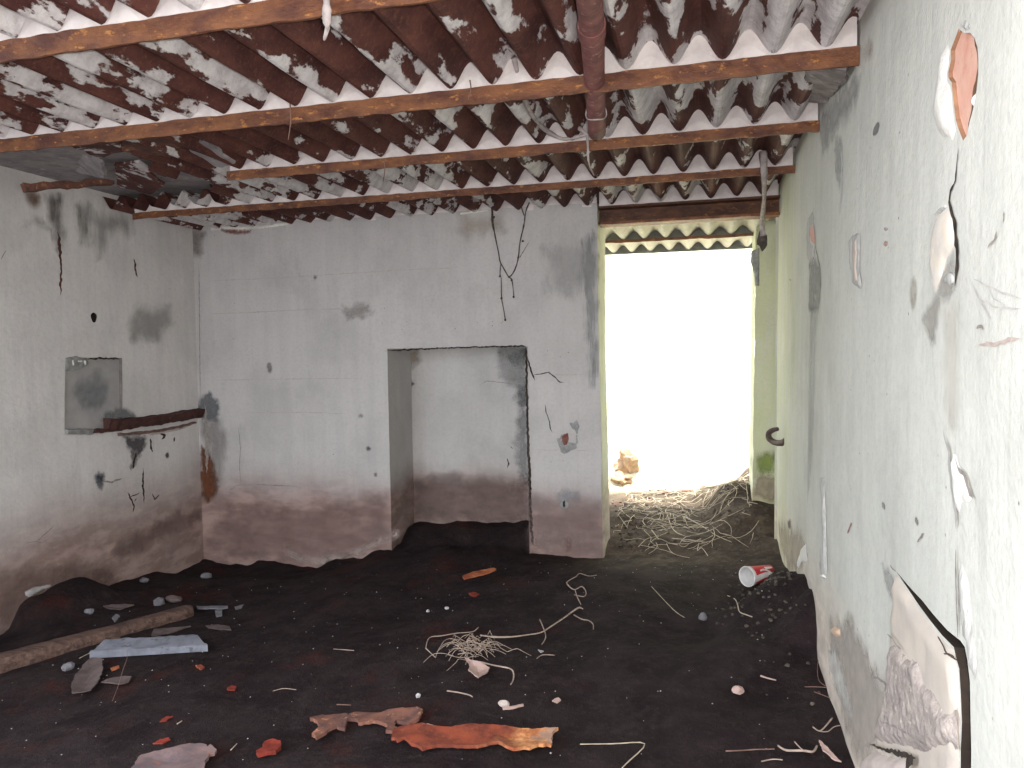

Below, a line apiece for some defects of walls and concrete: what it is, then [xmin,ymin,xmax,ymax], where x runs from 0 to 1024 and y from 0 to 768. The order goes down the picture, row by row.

spalling [933,20,978,140]
rust [20,137,236,205]
crack [55,232,63,295]
peeling [929,204,955,293]
leakage [96,474,122,488]
crack [128,470,159,511]
rust [200,447,217,502]
leakage [413,347,540,524]
crack [389,345,564,544]
spalling [557,420,580,454]
leakage [0,569,112,627]
spalling [874,549,977,768]